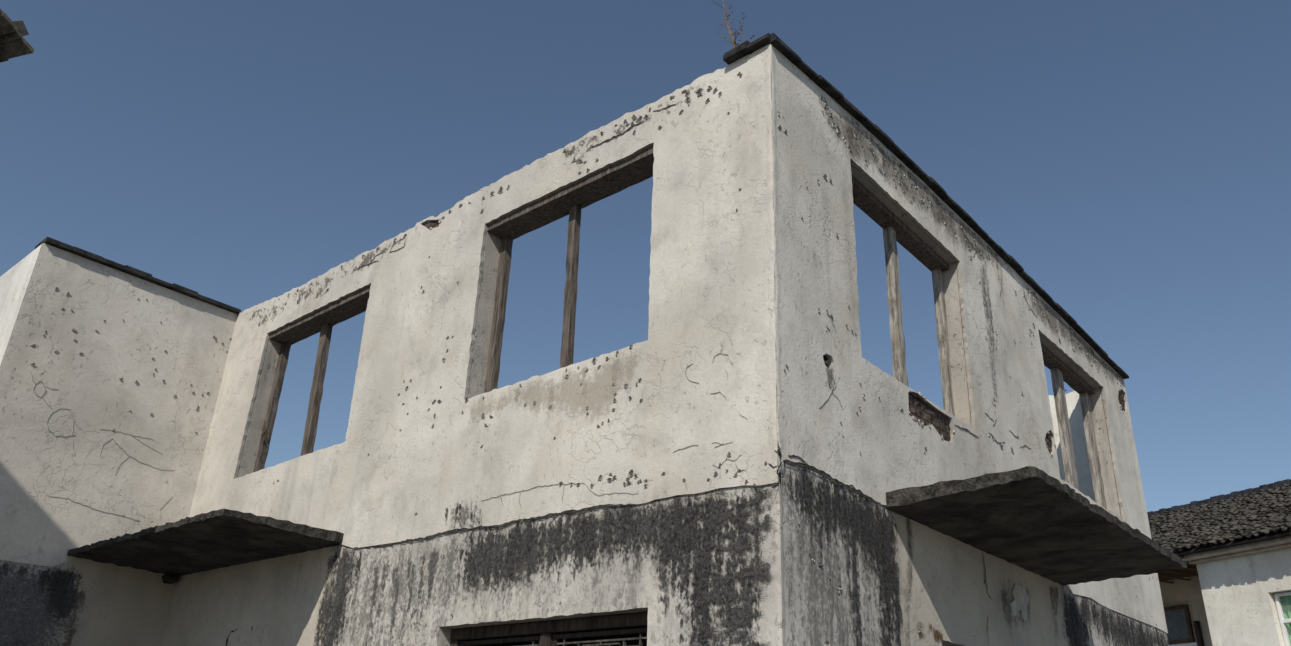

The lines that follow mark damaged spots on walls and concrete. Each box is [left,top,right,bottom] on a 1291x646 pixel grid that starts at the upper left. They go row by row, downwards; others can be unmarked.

crack [819,313,842,408]
crack [30,371,173,501]
crack [673,348,881,514]
flaking render [900,389,955,442]
damp [0,561,85,646]
crack [49,496,138,521]
damp [445,485,771,646]
damp [784,466,912,646]
damp [1051,586,1169,646]